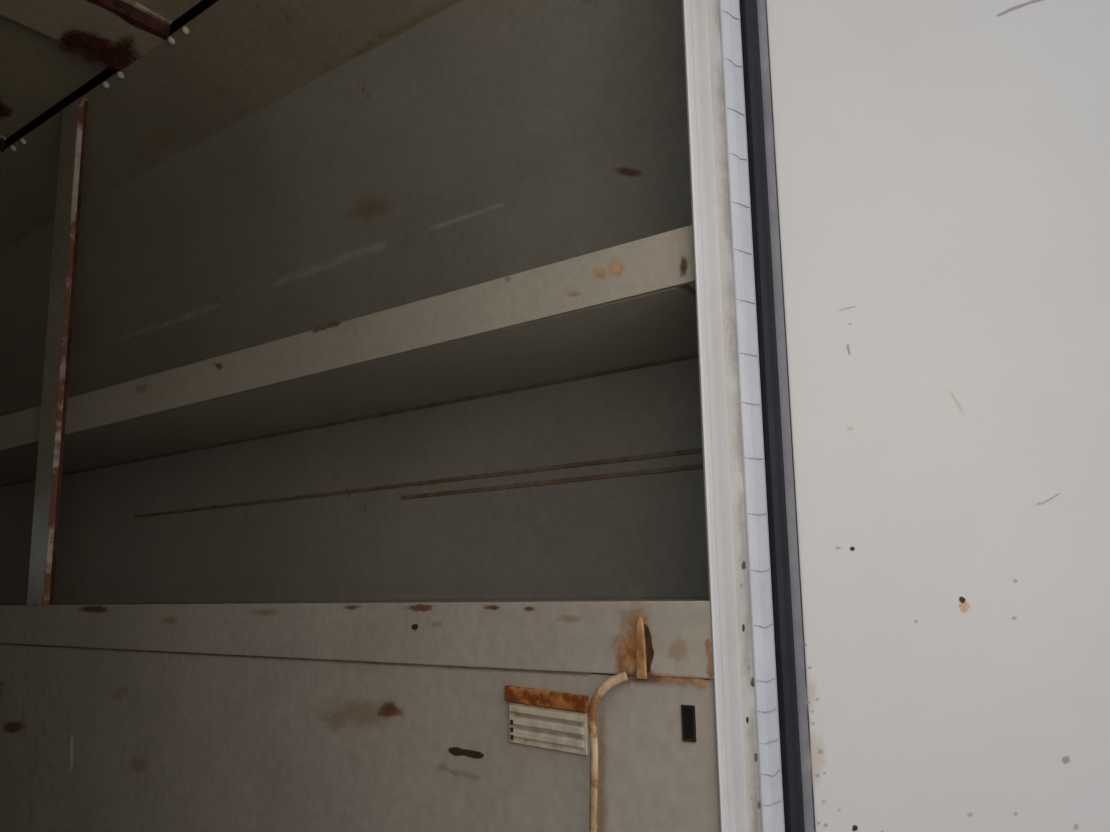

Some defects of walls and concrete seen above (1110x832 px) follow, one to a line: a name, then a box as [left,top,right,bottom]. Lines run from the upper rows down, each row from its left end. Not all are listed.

corrosion [60,0,170,70]
corrosion [43,97,88,606]
corrosion [410,604,431,630]
corrosion [617,613,712,686]
corrosion [378,704,400,717]
corrosion [505,685,589,712]